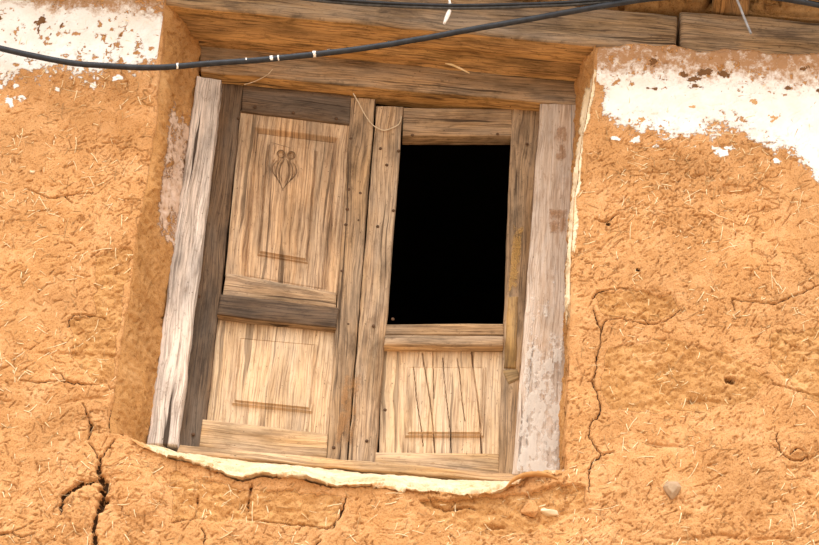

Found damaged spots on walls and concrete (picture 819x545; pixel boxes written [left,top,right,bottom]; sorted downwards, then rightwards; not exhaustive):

peeling [0,0,165,108]
peeling [564,44,819,326]
crack [33,373,114,545]
peeling [517,333,563,472]
crack [588,289,680,493]
spalling [600,339,771,414]
spalling [770,328,819,404]